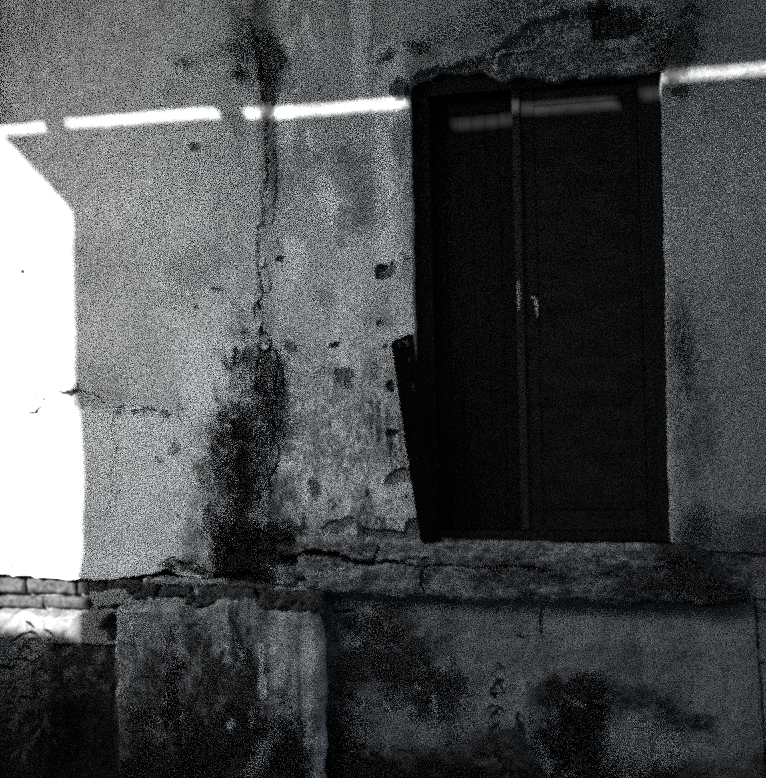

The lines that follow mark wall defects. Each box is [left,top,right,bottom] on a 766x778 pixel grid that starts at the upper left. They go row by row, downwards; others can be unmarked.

spalling [391,0,702,101]
crack [253,151,284,414]
spalling [0,557,327,614]
damp [182,346,302,584]
peeling [308,477,319,498]
peeling [364,519,418,539]
peeling [384,468,411,485]
crack [301,546,519,590]
damp [229,607,267,700]
damp [329,608,459,715]
damp [119,648,311,778]
damp [325,674,713,778]